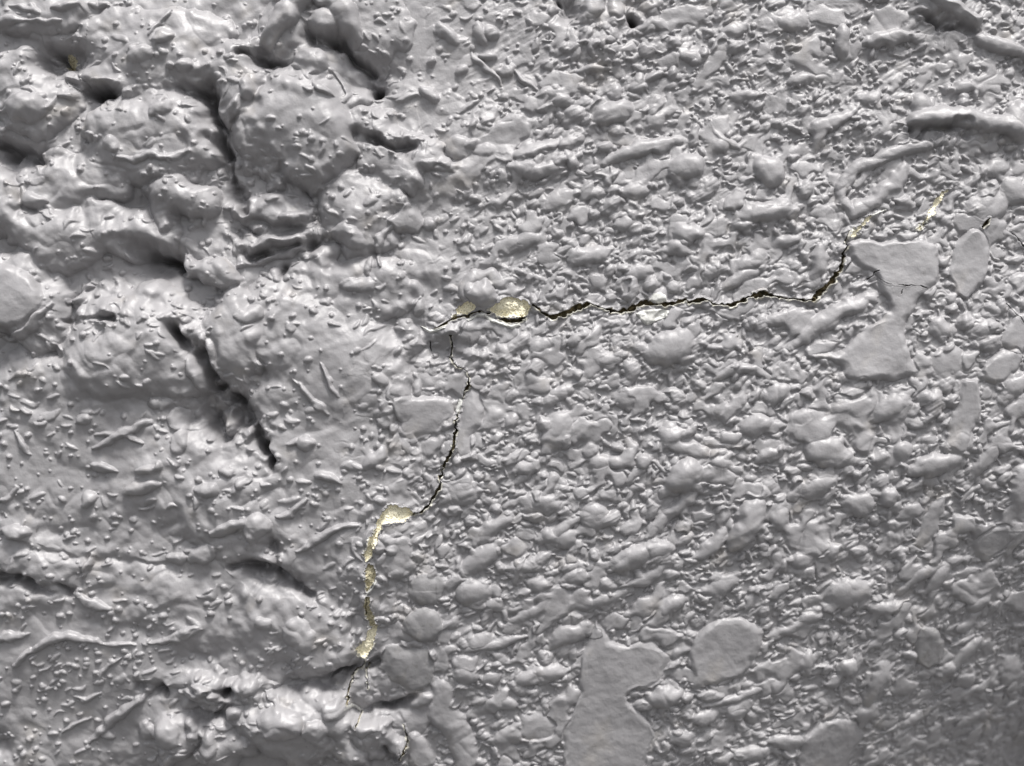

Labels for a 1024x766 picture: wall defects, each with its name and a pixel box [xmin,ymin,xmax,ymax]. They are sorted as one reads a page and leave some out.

crack [530,229,930,326]
crack [413,332,472,517]
crack [342,660,372,732]
crack [397,723,411,763]